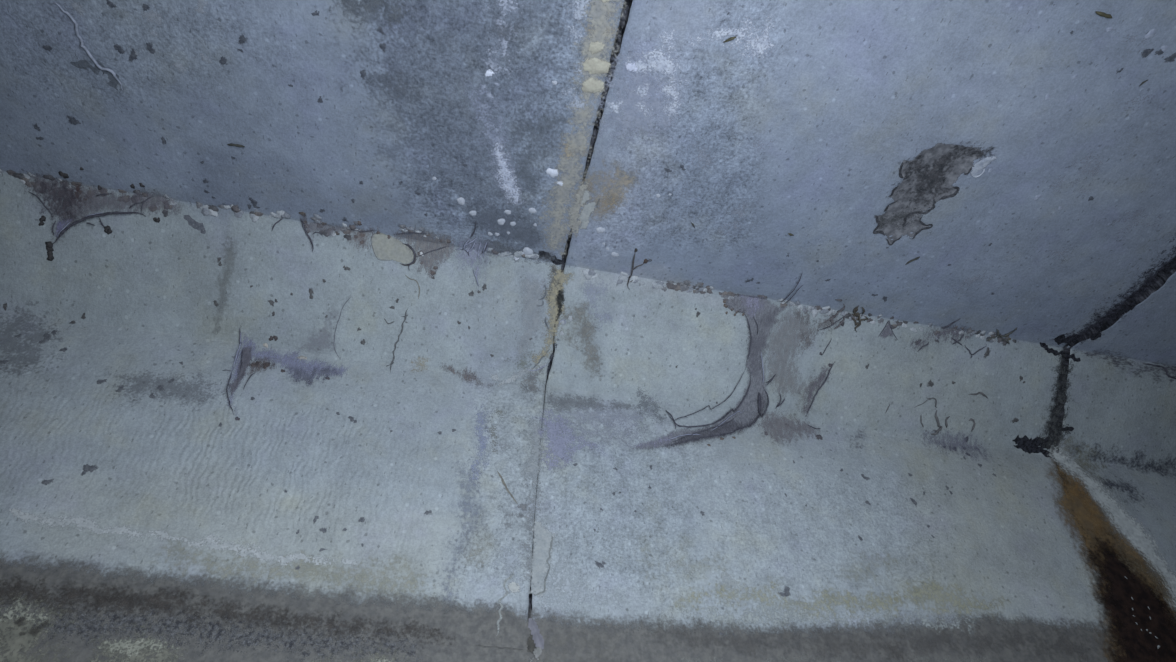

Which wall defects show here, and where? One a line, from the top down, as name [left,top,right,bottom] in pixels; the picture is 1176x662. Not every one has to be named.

spalling [873,143,997,245]
crack [1040,303,1137,362]
crack [1013,426,1074,458]
crack [533,534,553,596]
rust [1051,464,1176,662]